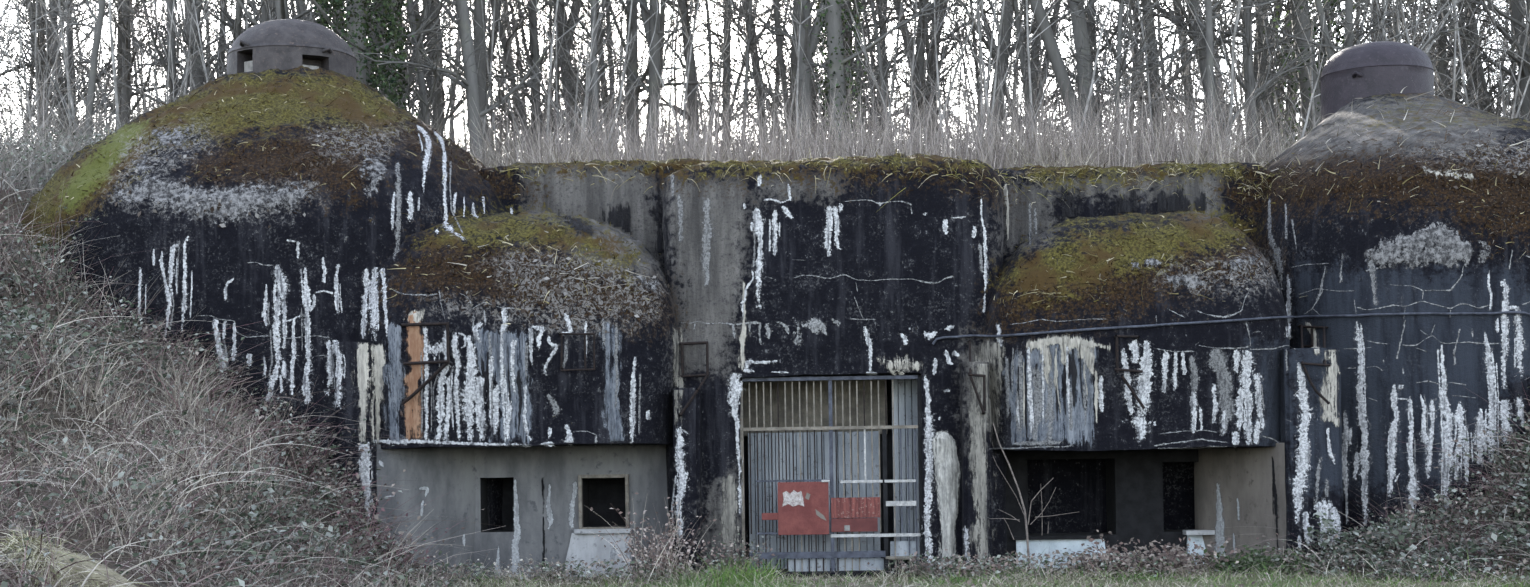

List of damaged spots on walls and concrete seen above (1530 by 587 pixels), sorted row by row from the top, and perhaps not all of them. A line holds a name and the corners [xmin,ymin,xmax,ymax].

water stain [138,236,193,335]
rust [404,310,425,440]
water stain [212,125,650,521]
water stain [671,325,690,539]
water stain [823,203,844,257]
water stain [863,326,877,376]
water stain [1028,186,1080,247]
water stain [900,198,1265,565]
water stain [1106,186,1208,215]
water stain [1267,199,1528,552]